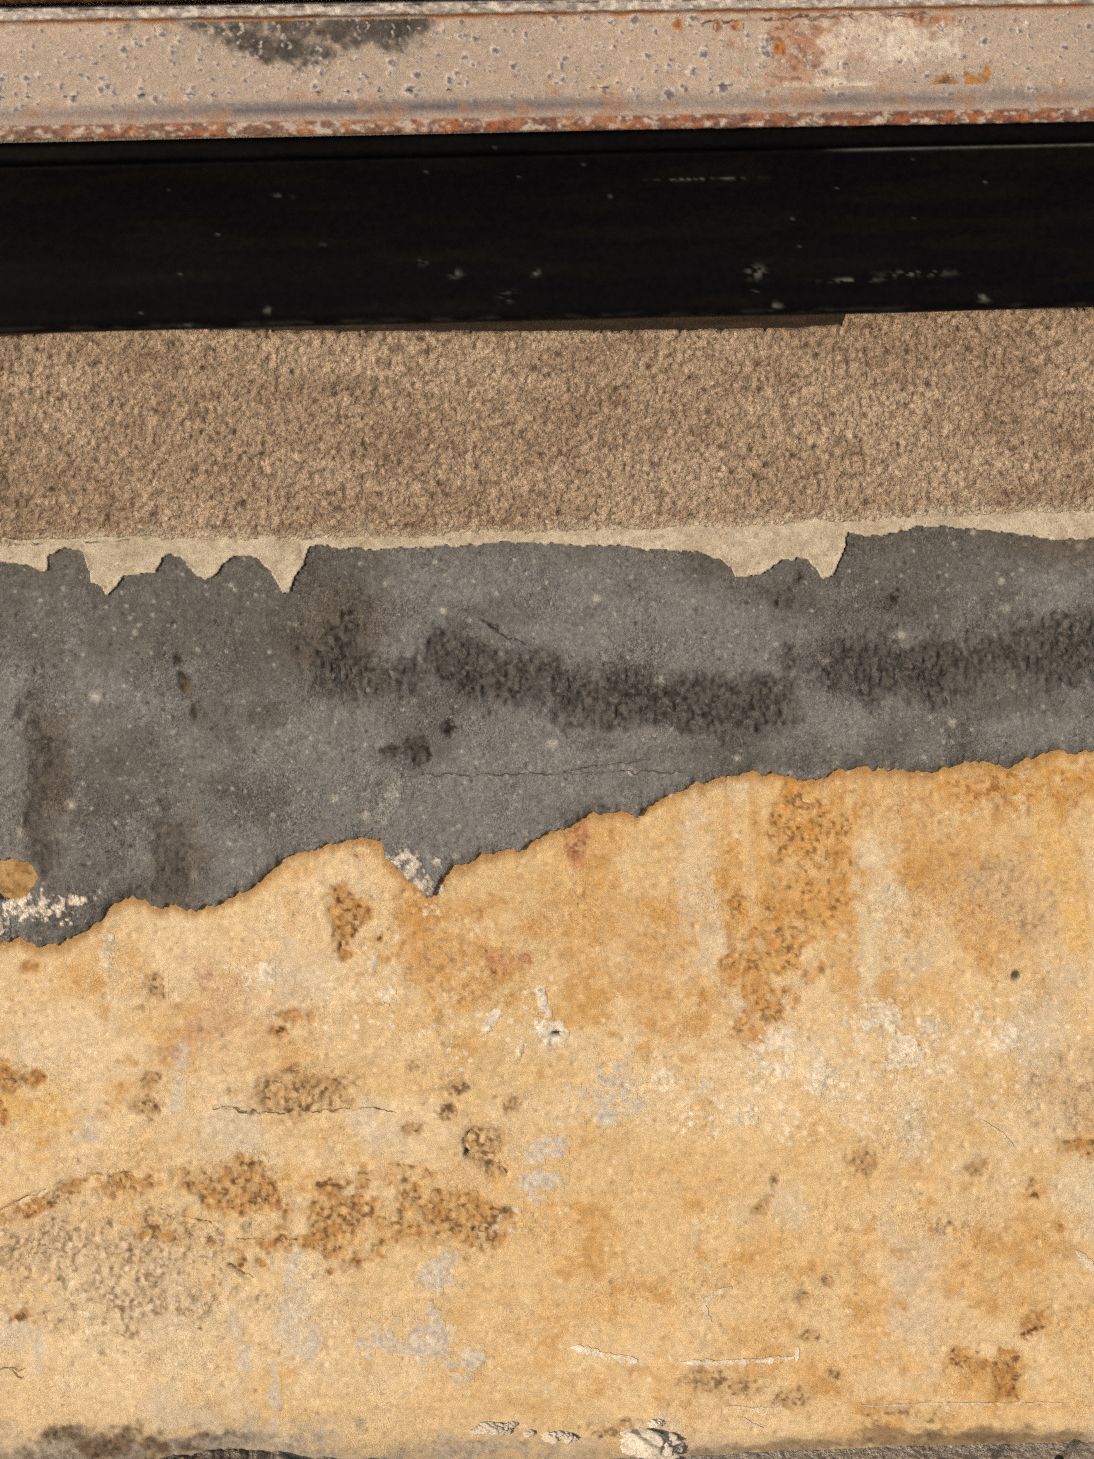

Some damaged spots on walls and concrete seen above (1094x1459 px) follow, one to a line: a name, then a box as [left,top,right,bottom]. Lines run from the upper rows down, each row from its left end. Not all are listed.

crack [0,537,159,545]
peeling [84,550,308,595]
peeling [716,543,845,613]
spalling [271,571,1094,779]
spalling [11,662,78,897]
efflorescence [0,887,89,938]
spalling [320,851,386,965]
water stain [667,781,728,988]
water stain [827,797,948,1078]
water stain [1024,786,1094,967]
water stain [965,1000,1024,1058]
spalling [0,1052,539,1364]